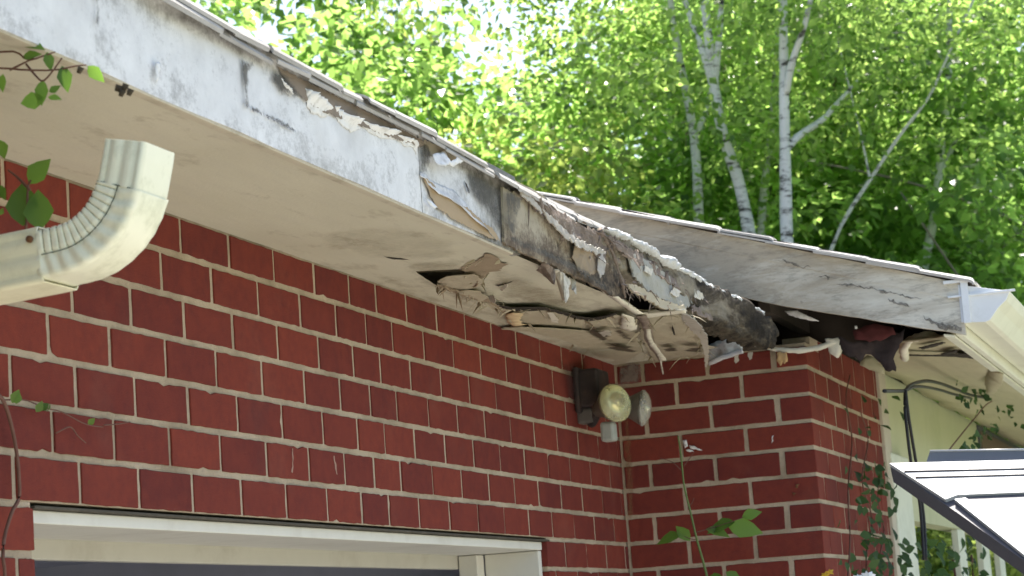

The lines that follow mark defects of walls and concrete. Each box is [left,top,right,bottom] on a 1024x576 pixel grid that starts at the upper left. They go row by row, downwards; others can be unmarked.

damp [237,48,252,106]
damp [274,73,297,96]
peeling [277,66,465,167]
peeling [419,172,500,242]
damp [470,174,603,286]
peeling [461,253,508,303]
peeling [536,263,576,303]
peeling [597,254,606,278]
crack [783,259,974,359]
peeling [636,315,667,374]